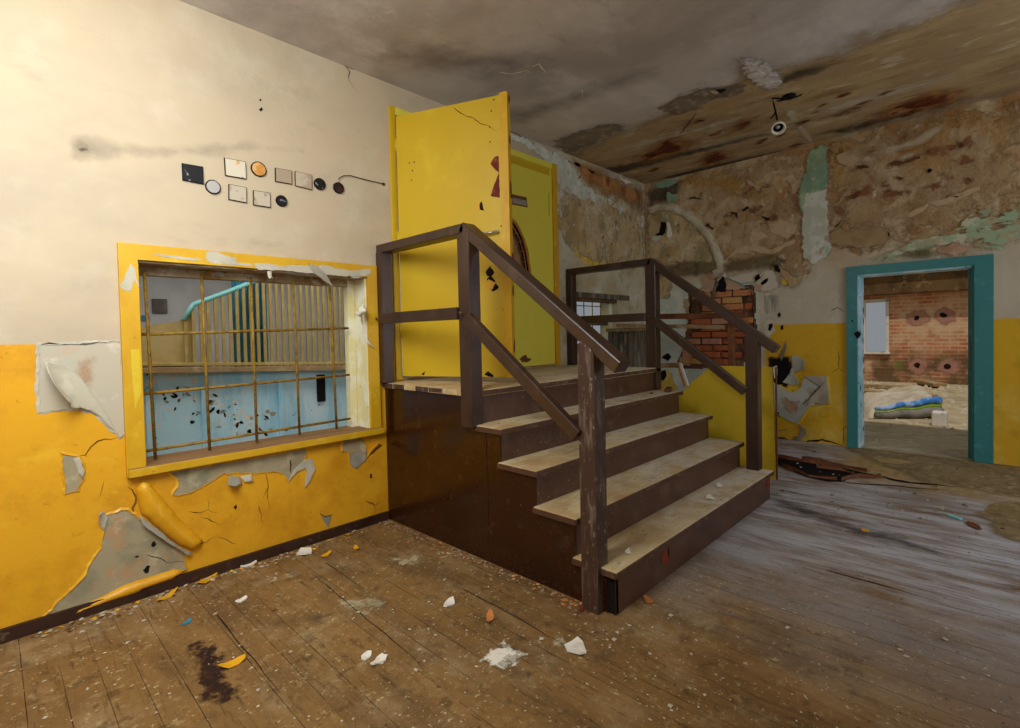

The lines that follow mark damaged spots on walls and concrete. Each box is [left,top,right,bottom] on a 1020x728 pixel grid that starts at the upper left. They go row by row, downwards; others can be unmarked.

peeling [737,57,783,90]
rust [875,90,962,117]
rust [640,137,692,172]
flaking render [821,99,1020,256]
flaking render [558,151,832,439]
peeling [34,339,149,440]
peeling [158,375,288,436]
peeling [59,452,87,496]
peeling [167,447,315,497]
peeling [340,437,367,468]
peeling [42,507,188,616]